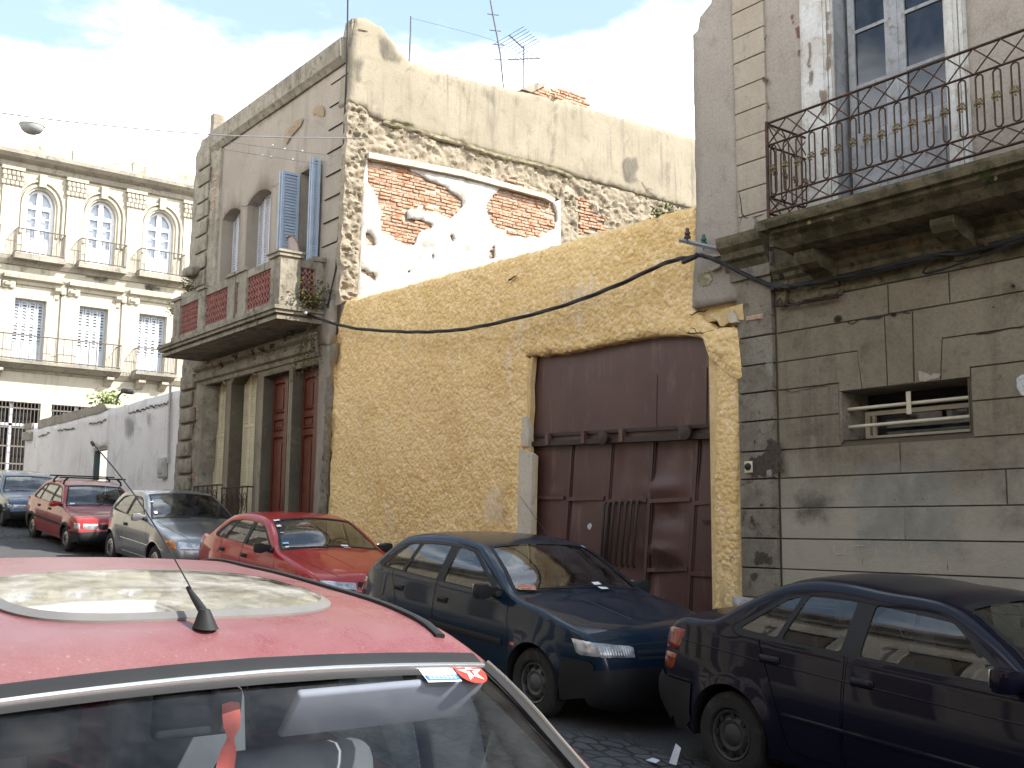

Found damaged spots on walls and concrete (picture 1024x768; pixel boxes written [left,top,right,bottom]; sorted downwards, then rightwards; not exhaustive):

water stain [381,38,397,60]
peeling [791,15,827,115]
water stain [624,158,638,182]
spalling [335,101,689,306]
peeling [710,304,763,327]